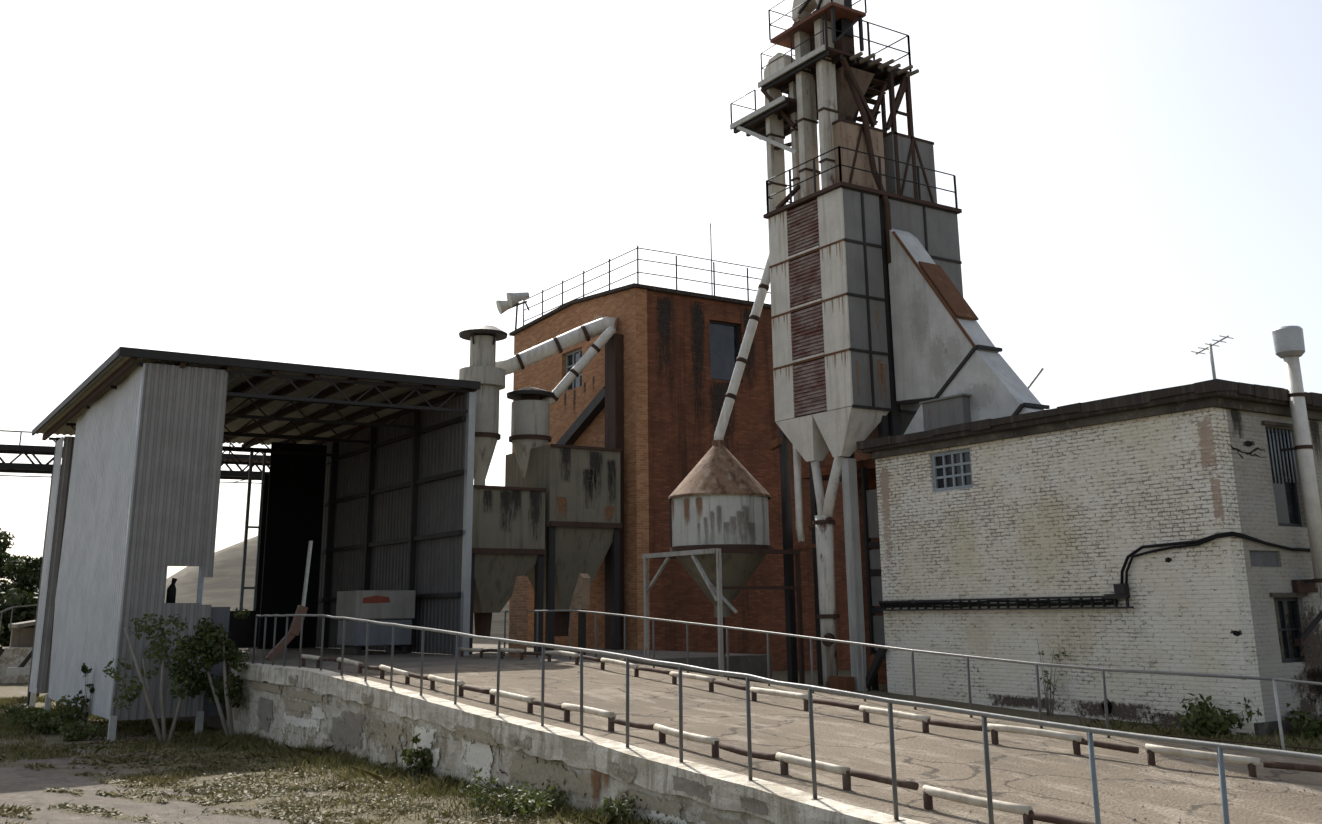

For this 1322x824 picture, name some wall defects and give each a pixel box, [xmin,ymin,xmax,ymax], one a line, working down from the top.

leakage [560,448,616,507]
leakage [483,490,542,538]
corrosion [672,497,702,522]
peeling [245,674,440,768]
peeling [454,724,768,824]